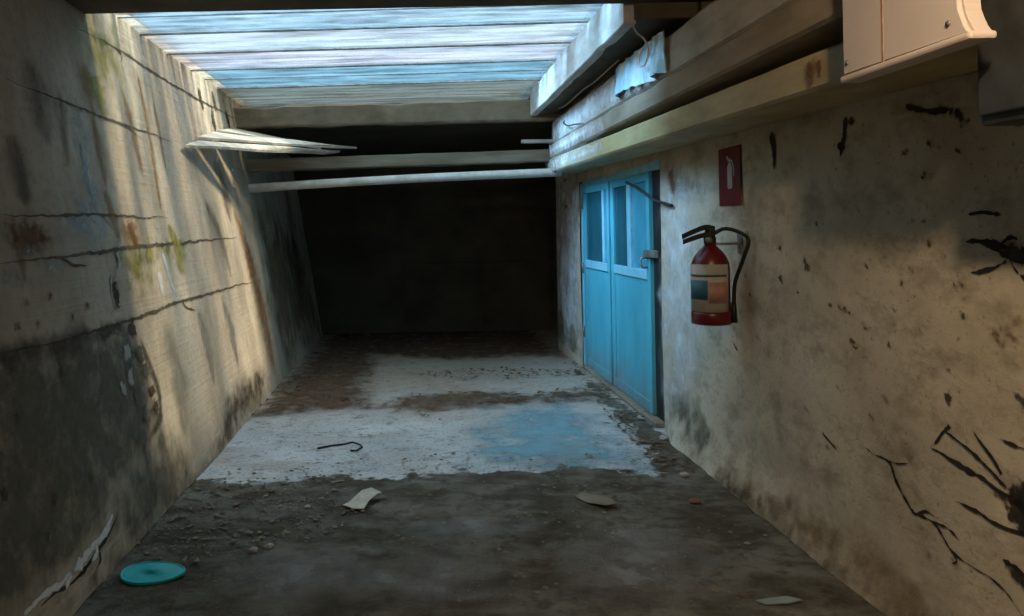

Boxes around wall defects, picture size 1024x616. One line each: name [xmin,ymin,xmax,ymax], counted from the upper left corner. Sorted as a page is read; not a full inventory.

crack [79,29,231,123]
crack [8,79,173,143]
crack [1,212,237,268]
crack [965,210,1024,279]
crack [40,279,261,346]
crack [931,424,1024,536]
crack [866,448,1024,616]